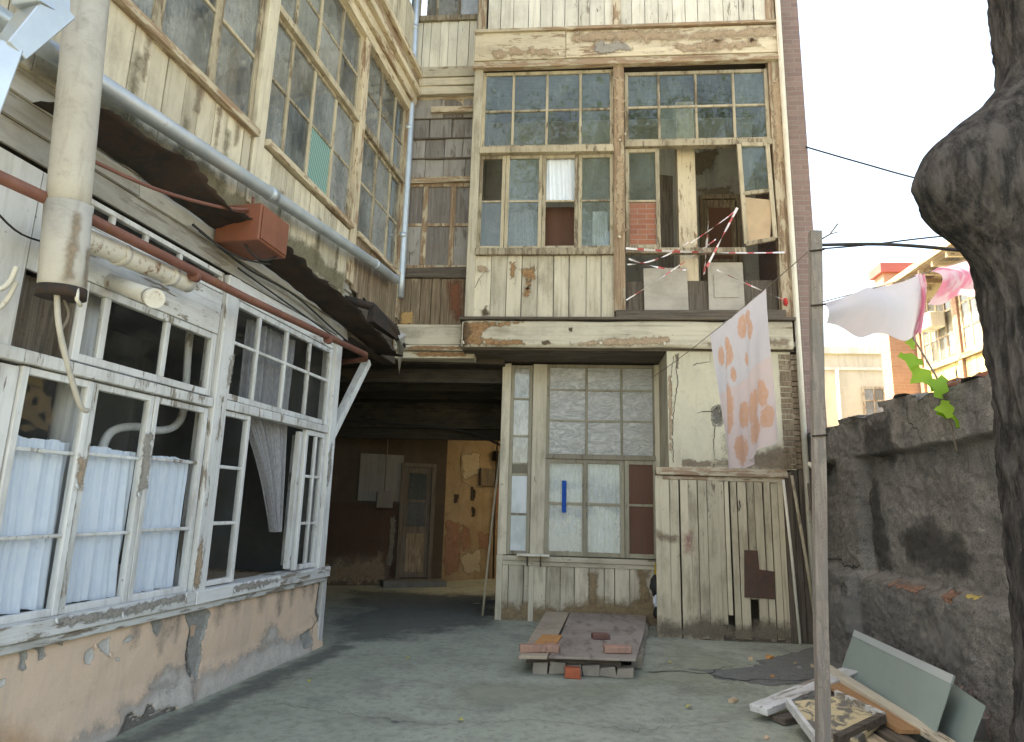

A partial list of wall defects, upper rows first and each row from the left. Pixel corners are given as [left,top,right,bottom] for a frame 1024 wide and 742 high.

peeling [492,46,560,59]
peeling [572,25,776,53]
peeling [569,328,669,346]
crack [670,356,724,466]
peeling [137,431,155,497]
flaking render [443,521,490,575]
damp [903,521,971,575]
flaking render [55,534,211,683]
peeling [234,578,279,594]
flaking render [300,582,320,649]
flaking render [18,646,45,671]
flaking render [119,704,176,734]